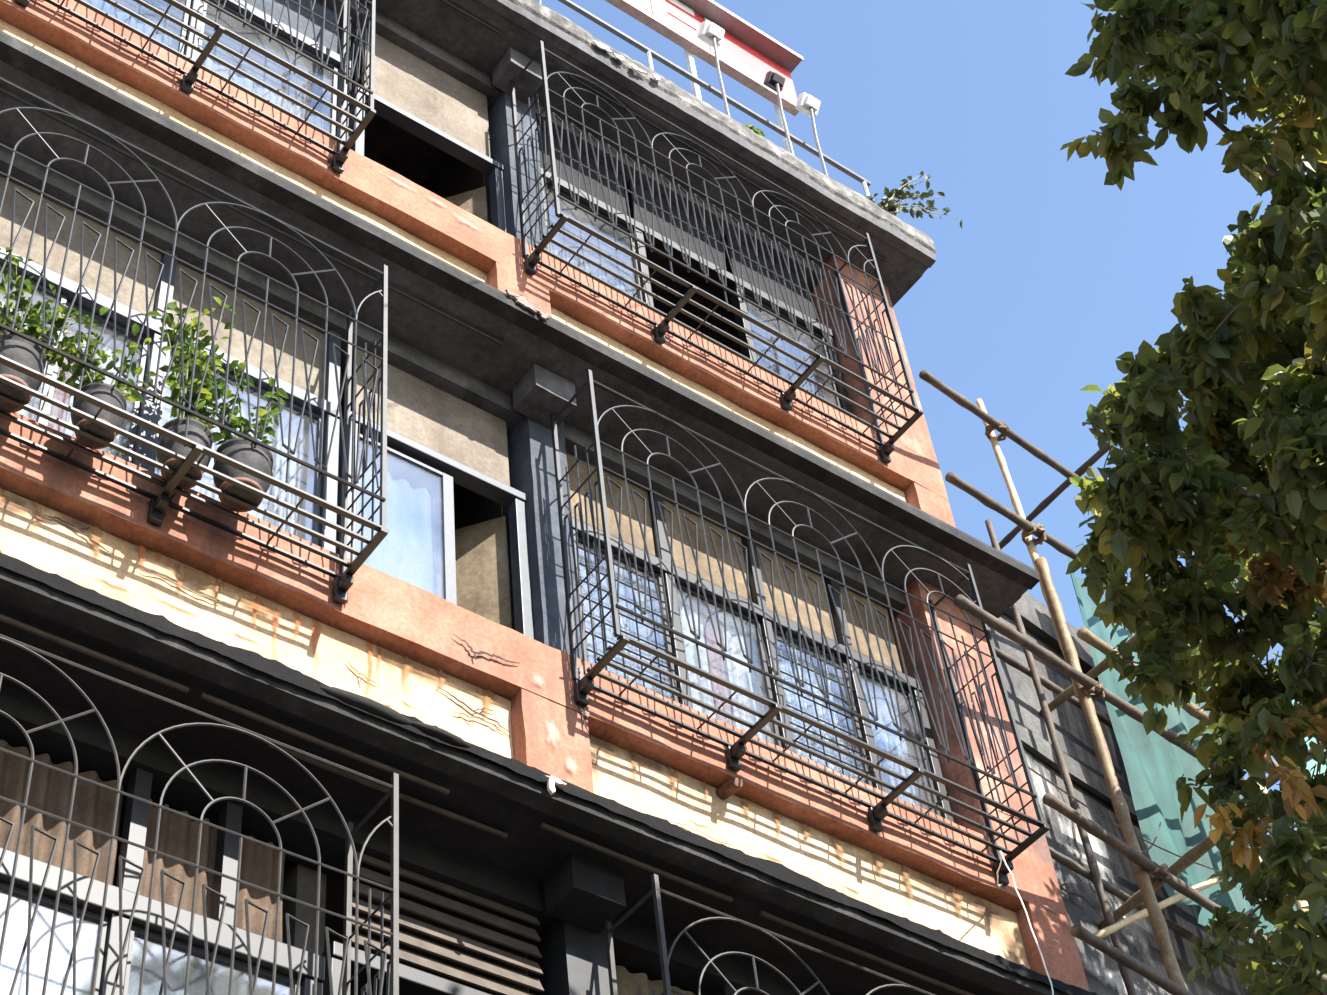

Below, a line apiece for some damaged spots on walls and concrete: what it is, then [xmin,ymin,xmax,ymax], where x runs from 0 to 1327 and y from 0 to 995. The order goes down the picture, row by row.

crack [44,515,233,605]
corrosion [295,609,320,657]
crack [453,634,520,663]
crack [437,686,511,735]